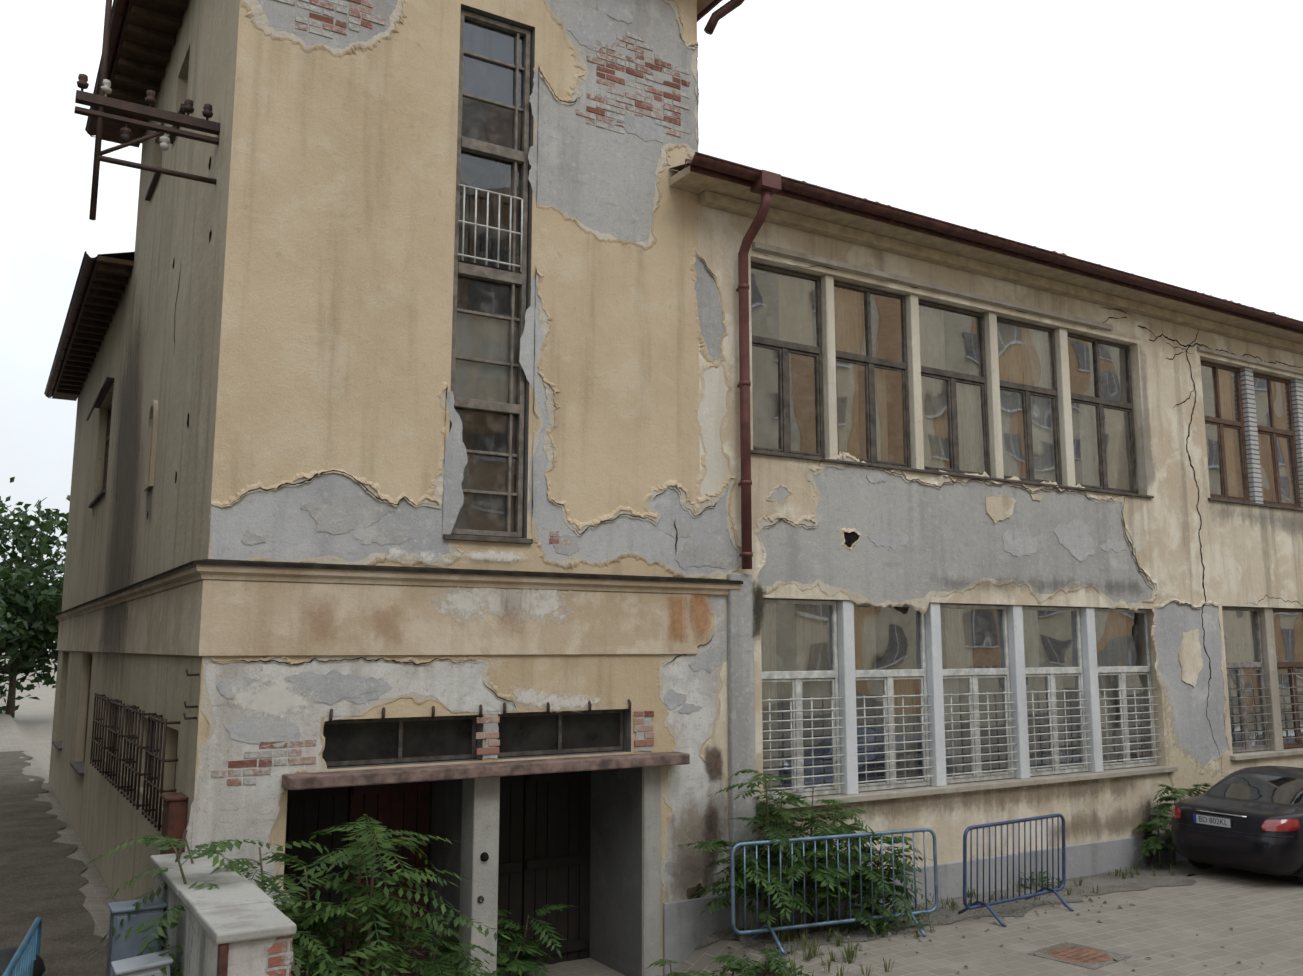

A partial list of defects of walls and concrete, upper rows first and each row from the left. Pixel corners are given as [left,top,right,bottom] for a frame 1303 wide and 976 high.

flaking render [240,0,408,58]
flaking render [528,0,699,251]
flaking render [208,382,521,568]
flaking render [519,247,1231,799]
crack [1149,329,1303,768]
flaking render [185,655,518,976]
flaking render [634,595,730,912]